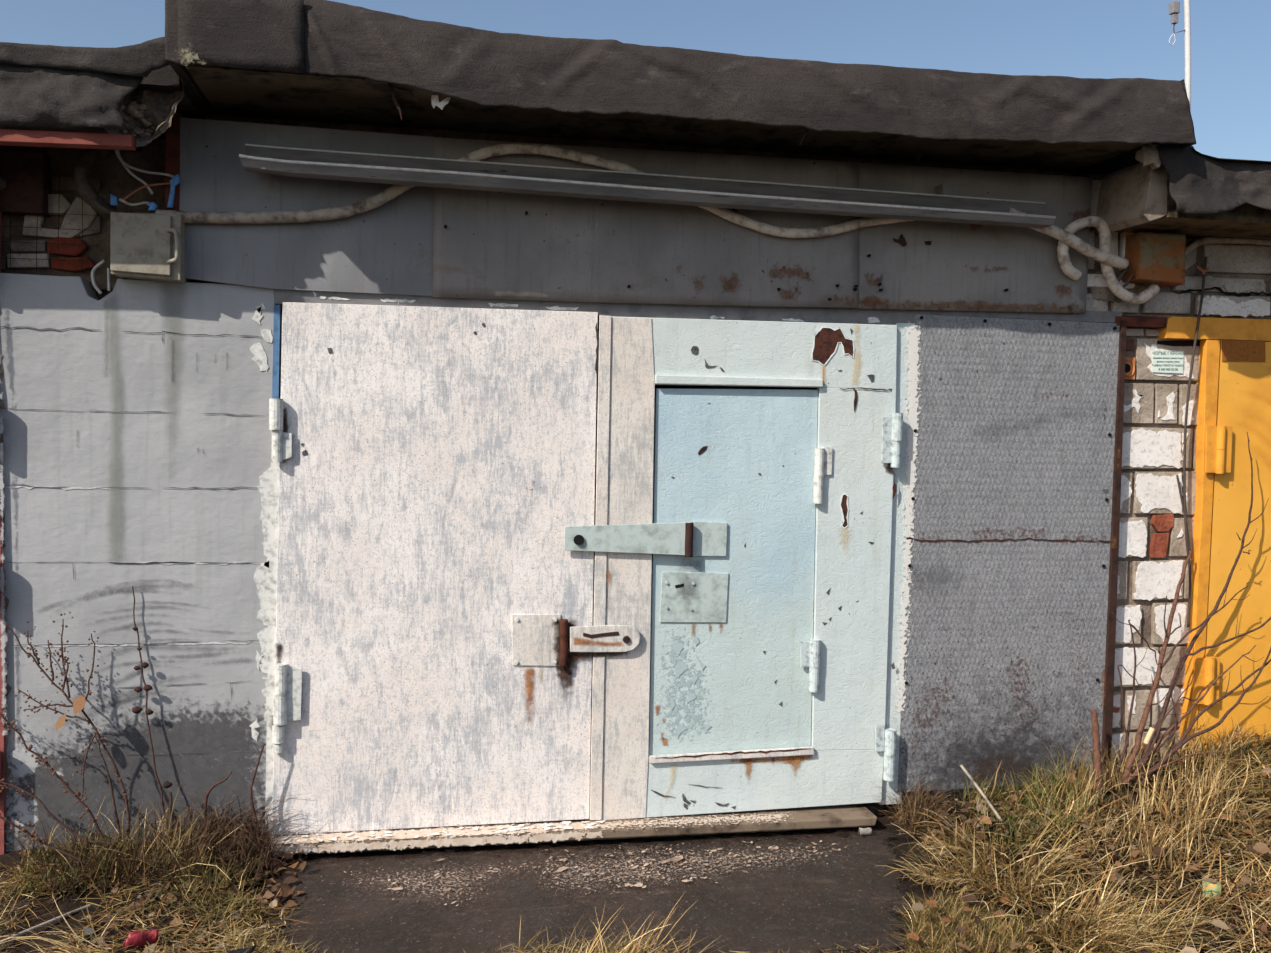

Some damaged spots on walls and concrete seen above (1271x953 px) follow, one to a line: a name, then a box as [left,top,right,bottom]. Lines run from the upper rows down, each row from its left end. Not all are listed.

spalling [104,77,184,147]
peeling [1144,343,1194,379]
peeling [1103,389,1196,760]
rust [525,668,541,707]
rust [554,619,628,688]
leakage [6,699,266,852]
rust [656,706,811,779]